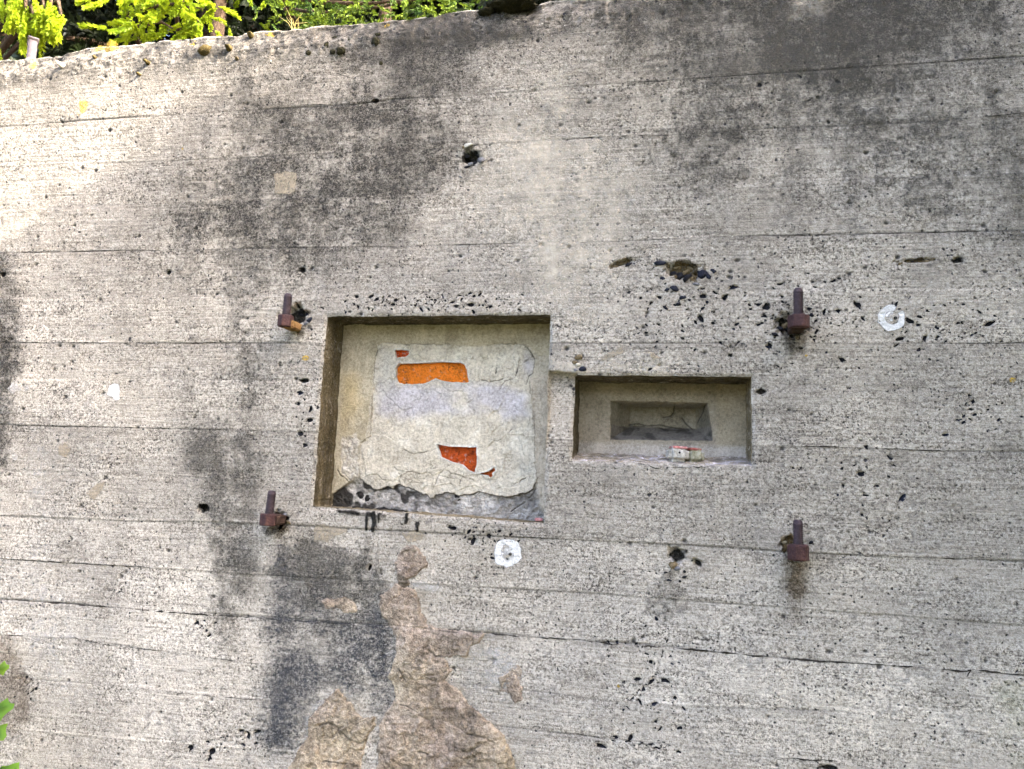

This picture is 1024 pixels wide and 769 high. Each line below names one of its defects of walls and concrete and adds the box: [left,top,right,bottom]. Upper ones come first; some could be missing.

water stain [173,11,539,305]
spalling [609,257,633,269]
spalling [616,260,872,376]
hole [892,301,999,351]
spalling [394,348,469,385]
spalling [437,444,495,478]
water stain [186,434,396,754]
peeling [288,545,516,769]
peeling [498,664,523,704]